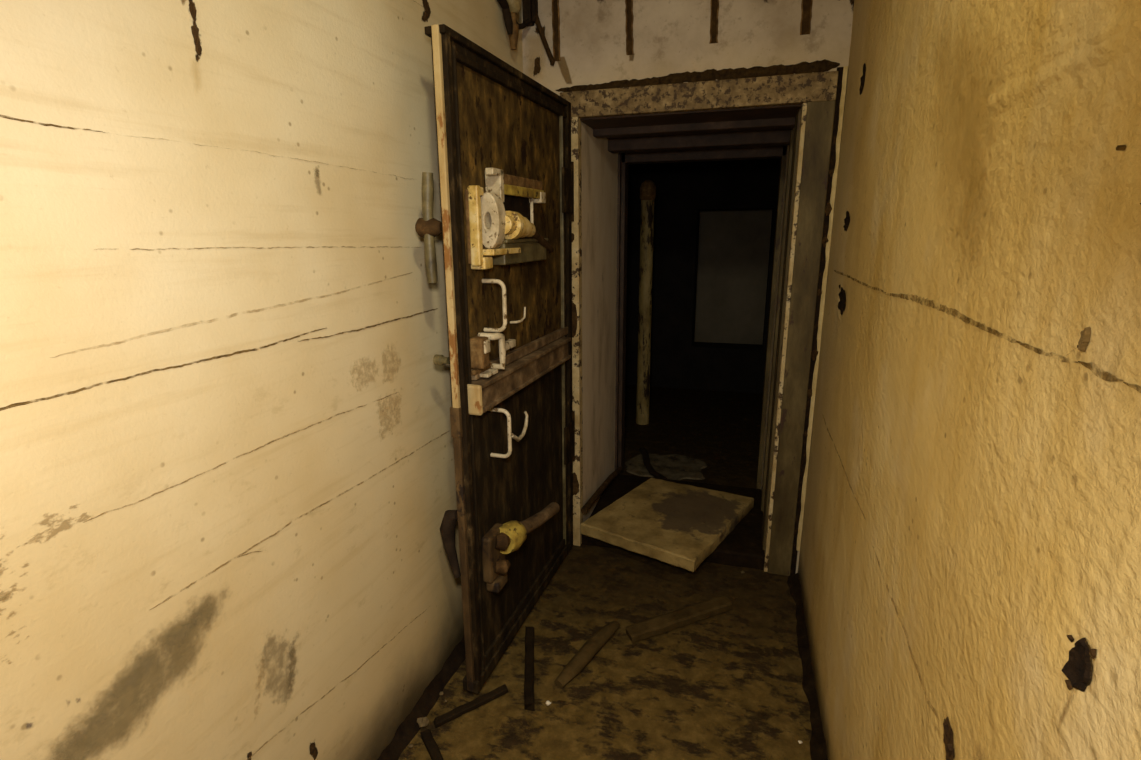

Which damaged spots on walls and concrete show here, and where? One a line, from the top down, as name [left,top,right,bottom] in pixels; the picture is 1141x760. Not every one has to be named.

crack [0,115,105,133]
crack [0,309,435,411]
crack [834,270,1140,391]
water stain [55,597,215,760]
hole [1061,635,1097,692]